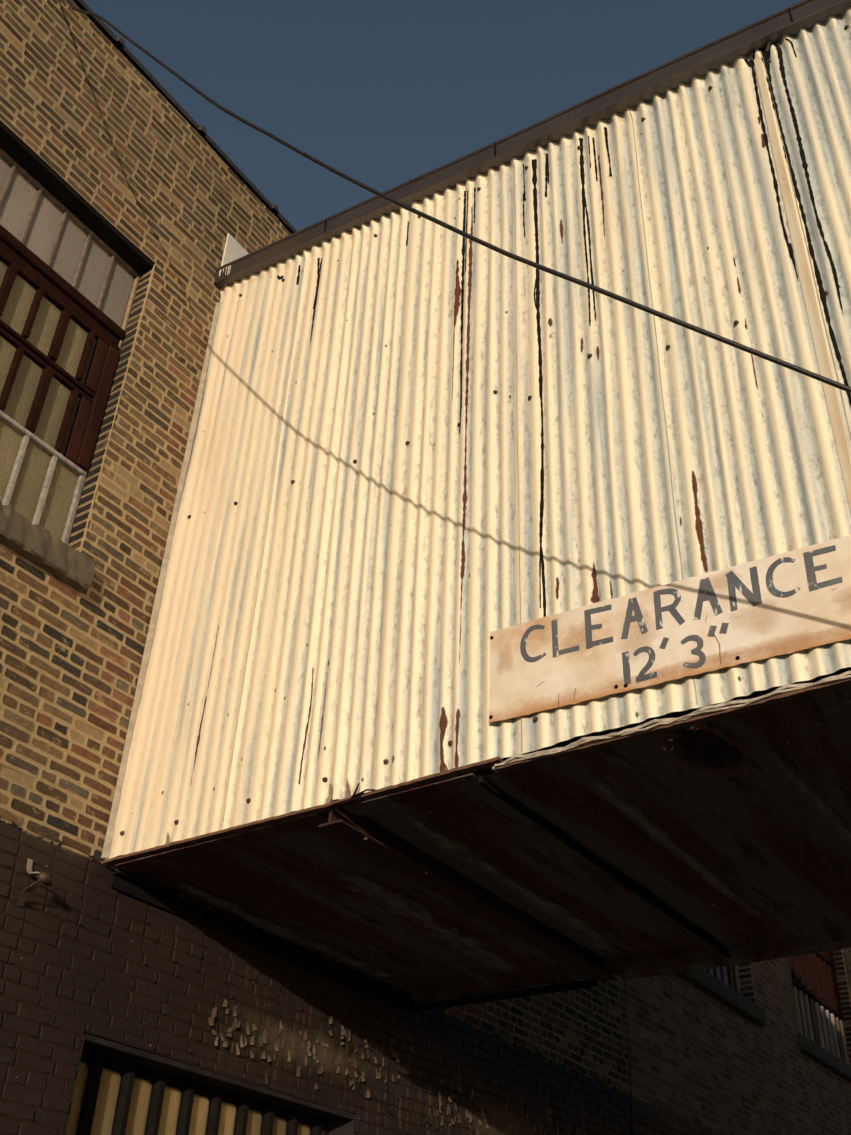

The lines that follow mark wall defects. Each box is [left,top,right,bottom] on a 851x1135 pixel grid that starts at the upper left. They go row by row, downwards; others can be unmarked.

corrosion [452,207,473,608]
corrosion [680,471,708,572]
corrosion [590,562,613,603]
corrosion [102,668,851,866]
peeling [209,999,400,1098]
peeling [436,1079,579,1135]